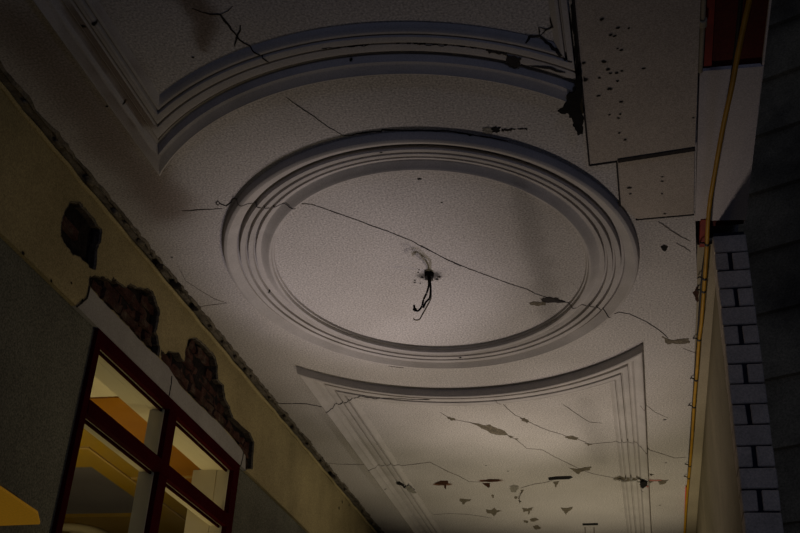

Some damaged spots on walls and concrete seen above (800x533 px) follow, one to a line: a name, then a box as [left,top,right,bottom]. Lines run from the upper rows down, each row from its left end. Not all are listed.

crack [192,6,268,62]
crack [396,41,477,49]
crack [522,18,572,73]
flaking render [557,4,584,136]
flaking render [0,60,384,533]
crack [189,198,694,353]
crack [268,395,613,478]
peeling [471,422,517,440]
crack [494,399,684,458]
peeling [509,485,541,530]
flaking render [548,467,592,487]
flaking render [614,475,668,489]